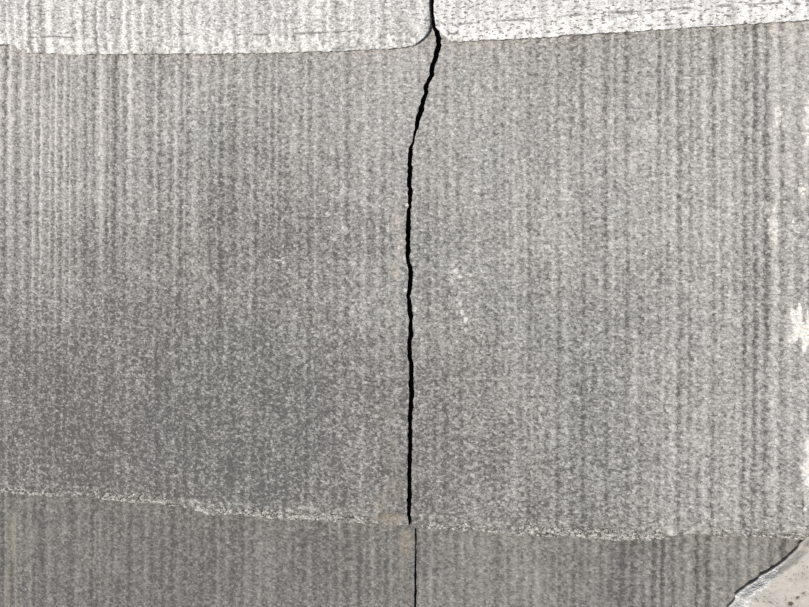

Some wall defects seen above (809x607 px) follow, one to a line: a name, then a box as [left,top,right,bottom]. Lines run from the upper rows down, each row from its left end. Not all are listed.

peeling [774,105,787,127]
peeling [764,184,780,253]
crack [402,0,442,525]
peeling [786,303,809,353]
peeling [800,435,809,511]